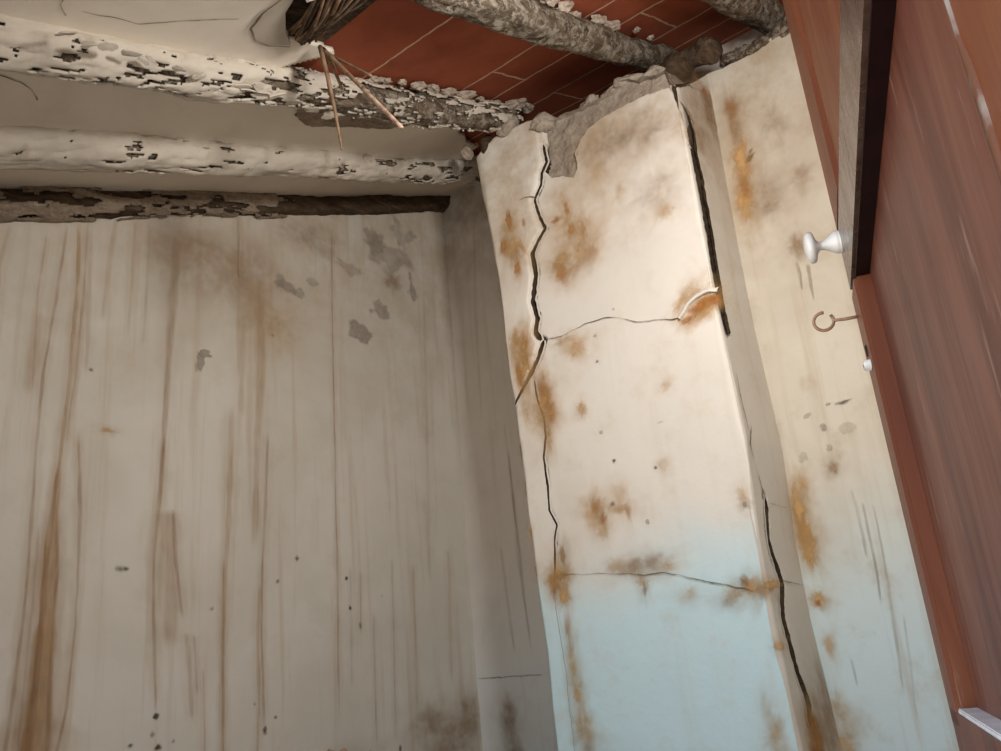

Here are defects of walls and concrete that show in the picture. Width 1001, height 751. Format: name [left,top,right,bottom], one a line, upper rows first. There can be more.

flaking render [54,31,159,66]
flaking render [252,0,293,45]
flaking render [230,82,411,129]
flaking render [544,74,673,180]
corrosion [730,113,752,217]
crack [672,85,731,335]
corrosion [685,295,721,323]
corrosion [513,337,529,388]
crack [515,144,678,751]
crack [595,572,749,590]
crack [737,378,813,728]
corrosion [793,484,815,561]